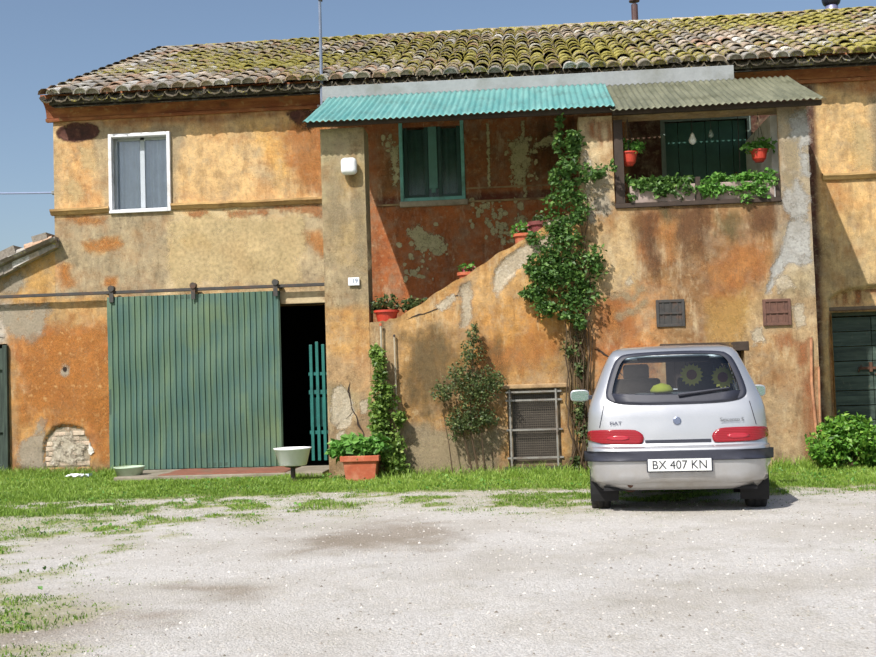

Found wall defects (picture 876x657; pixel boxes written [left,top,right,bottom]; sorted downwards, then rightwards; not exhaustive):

peeling [381,134,400,187]
flaking render [469,130,570,296]
flaking render [766,108,812,293]
peeling [396,222,455,282]
flaking render [792,303,806,327]
flaking render [330,385,368,440]
crack [347,384,365,437]